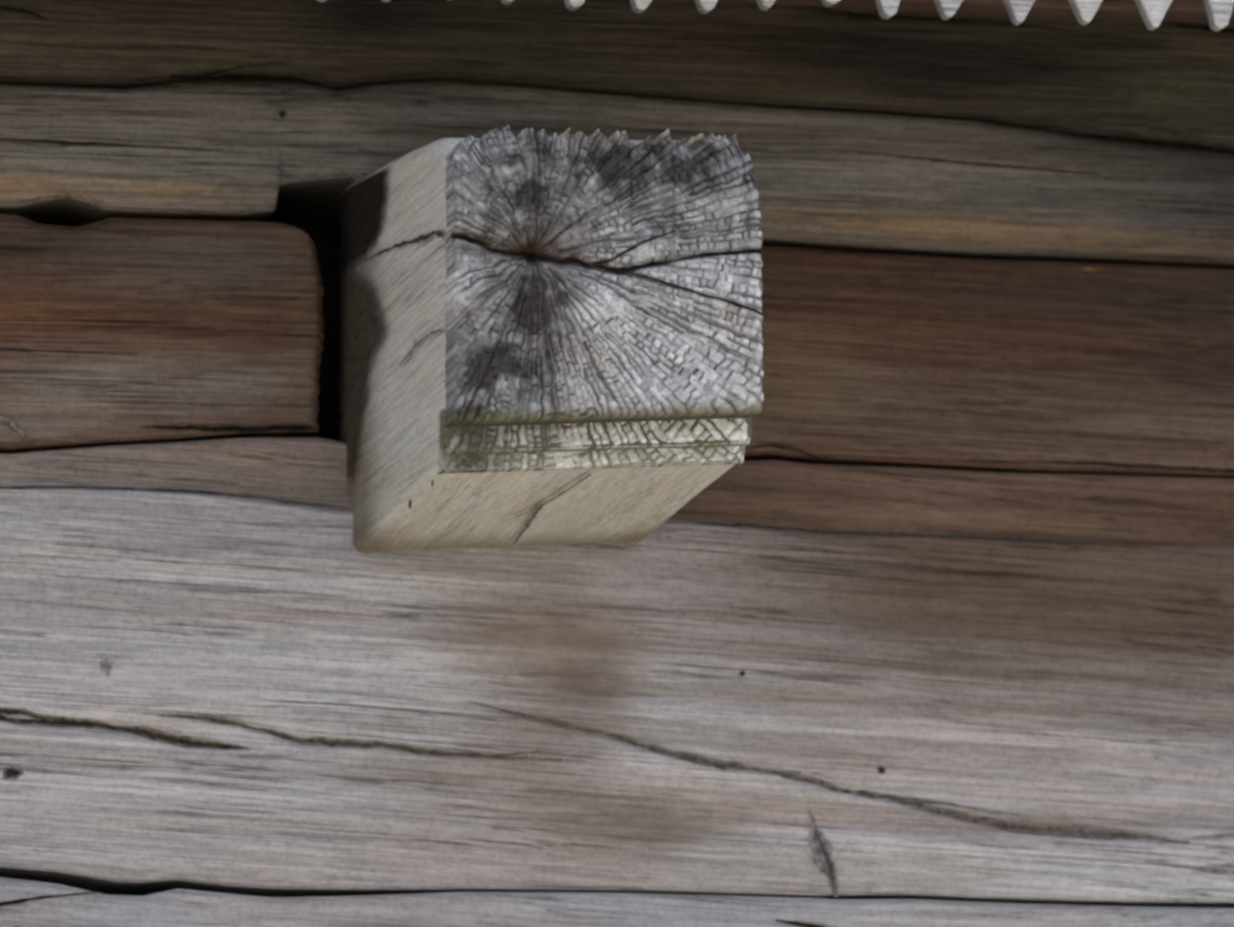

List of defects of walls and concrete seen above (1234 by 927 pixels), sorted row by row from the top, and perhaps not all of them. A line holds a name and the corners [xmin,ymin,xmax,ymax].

crack [364,229,765,317]
crack [506,474,592,545]
crack [0,701,1234,874]
crack [0,891,102,906]